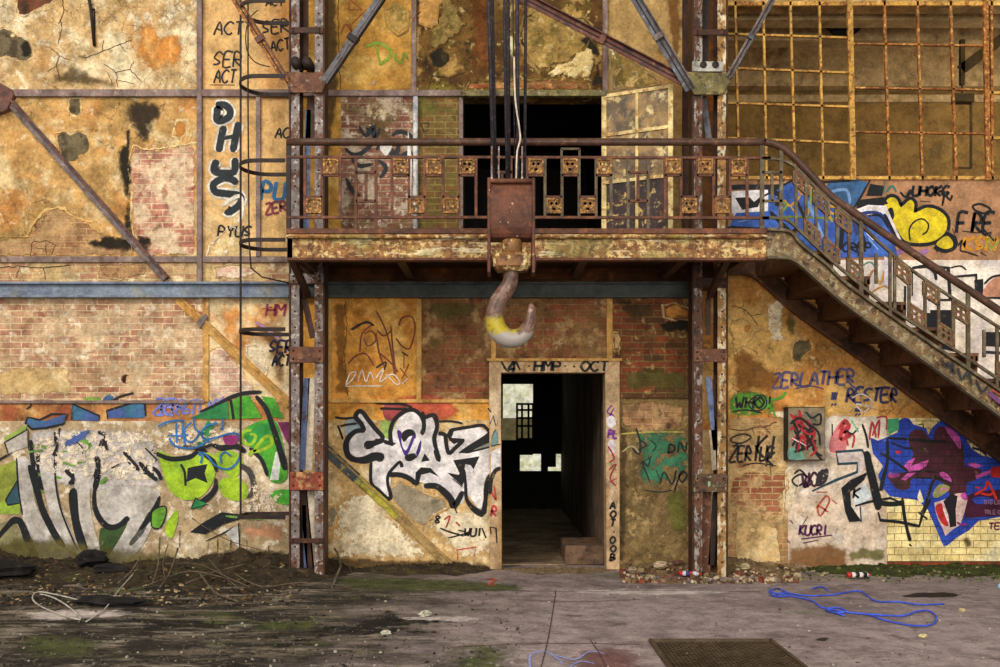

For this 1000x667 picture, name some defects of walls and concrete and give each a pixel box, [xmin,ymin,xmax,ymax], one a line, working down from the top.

damp [21,41,31,57]
crack [50,0,142,86]
damp [430,49,449,67]
spalling [465,9,594,90]
damp [119,102,159,196]
spalling [0,118,259,281]
spalling [729,461,800,540]